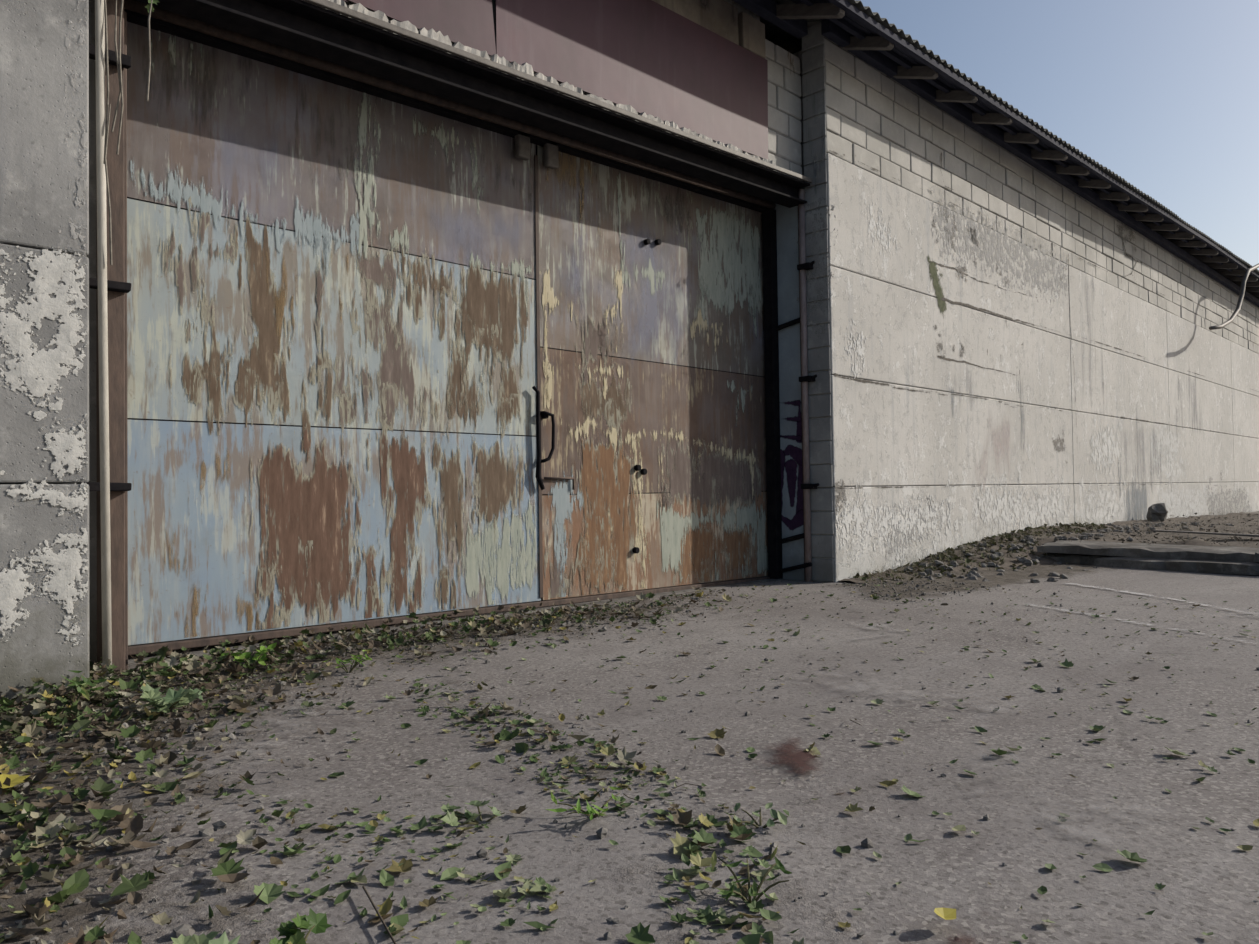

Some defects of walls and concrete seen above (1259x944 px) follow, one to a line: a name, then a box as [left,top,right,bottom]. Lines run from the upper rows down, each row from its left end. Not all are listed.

peeling [65,115,88,207]
peeling [0,221,88,654]
corrosion [159,196,532,638]
corrosion [544,372,637,598]
corrosion [658,438,764,585]